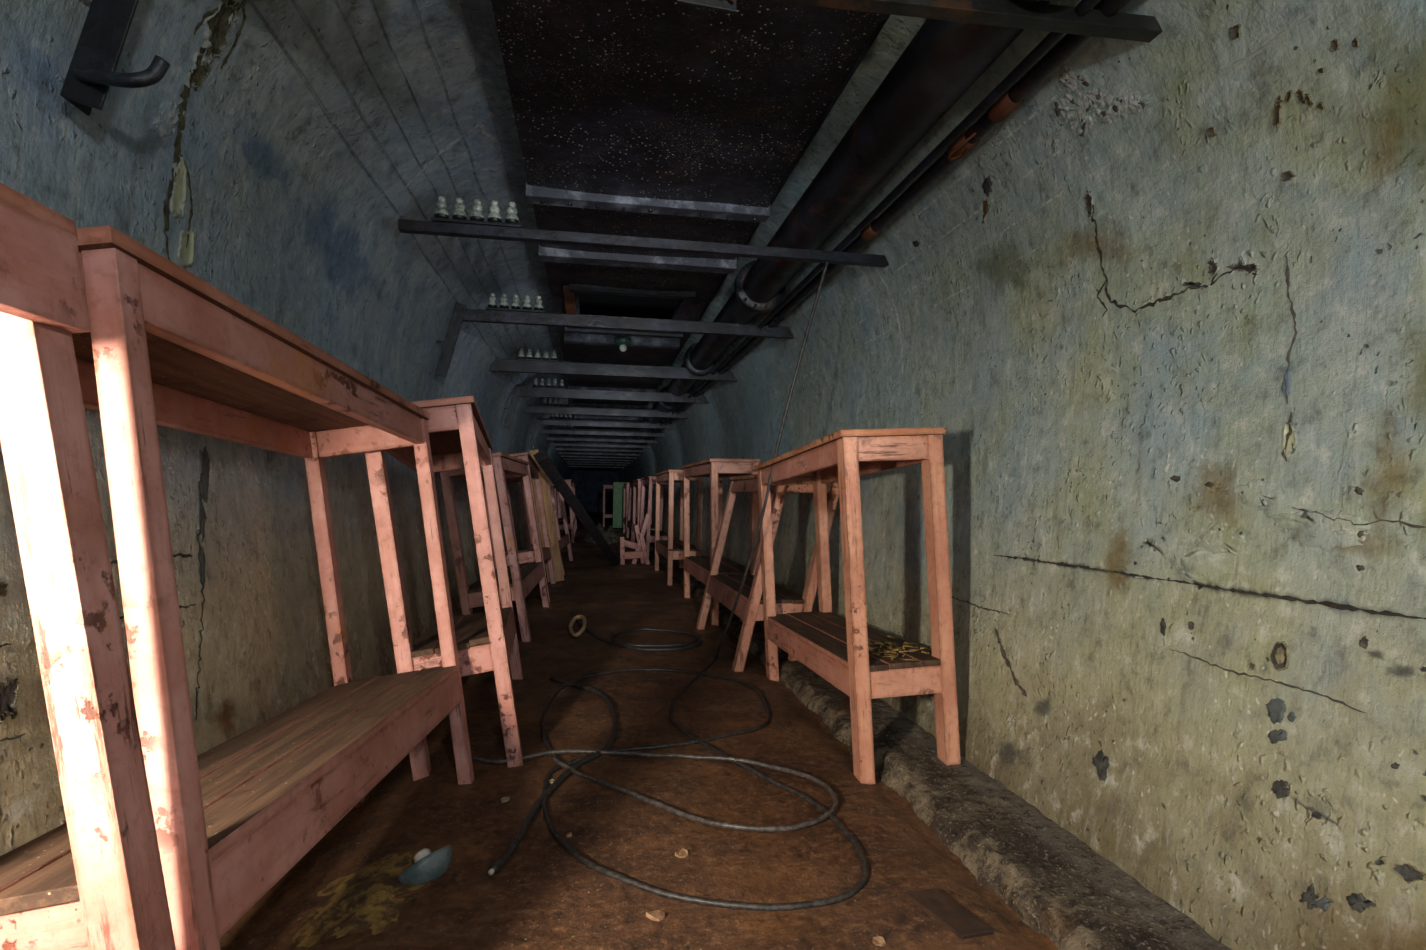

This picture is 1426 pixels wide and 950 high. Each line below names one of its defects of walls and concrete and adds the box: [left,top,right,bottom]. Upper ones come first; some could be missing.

crack [1087,191,1297,404]
crack [173,443,210,720]
crack [995,555,1426,619]
crack [952,596,1027,697]
crack [1170,649,1365,713]
crack [0,734,25,742]
peeling [1265,698,1296,744]